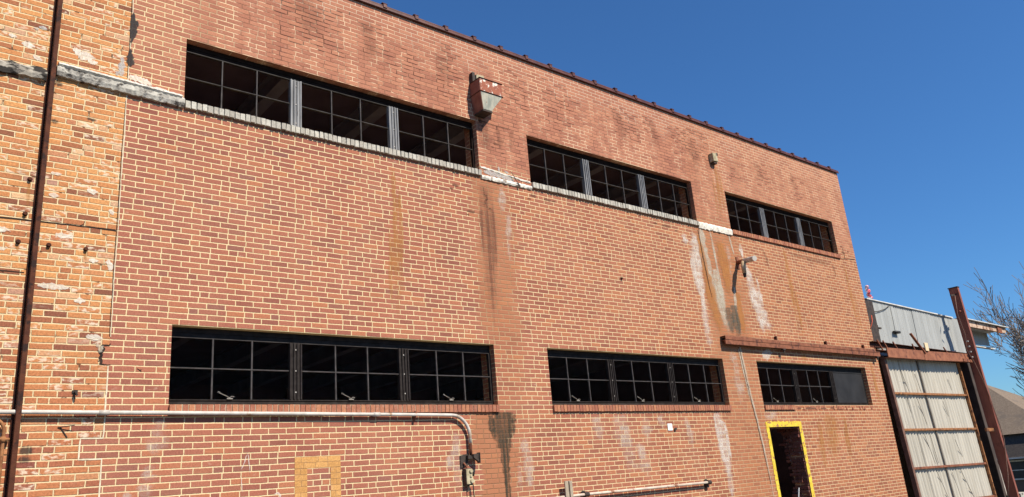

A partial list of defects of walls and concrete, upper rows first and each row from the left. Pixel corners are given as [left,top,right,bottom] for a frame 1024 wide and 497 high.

peeling [116,57,167,91]
water stain [683,236,741,331]
corrosion [697,237,730,323]
water stain [729,237,769,326]
water stain [489,413,516,497]